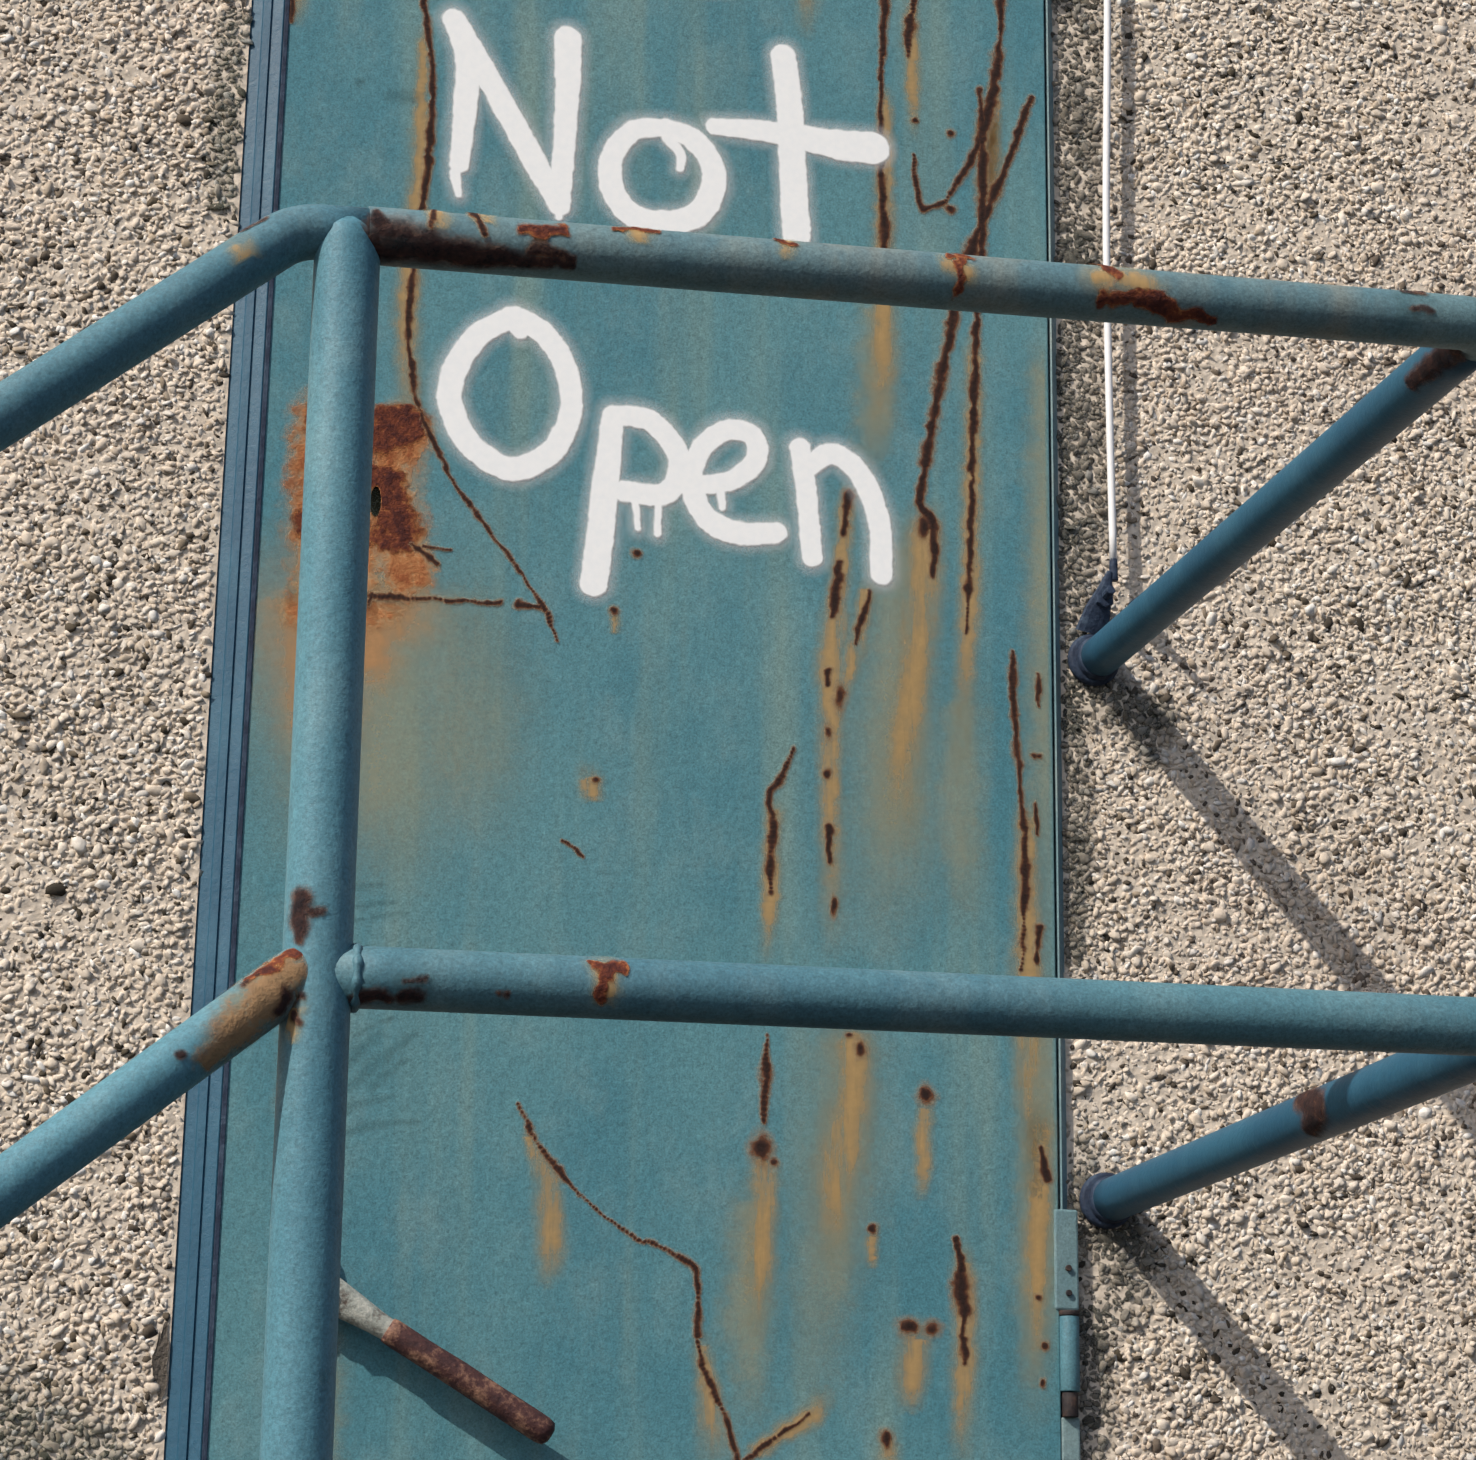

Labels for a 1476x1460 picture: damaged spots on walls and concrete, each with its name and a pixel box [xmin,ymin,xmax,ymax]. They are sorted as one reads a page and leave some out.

corrosion [363,209,577,270]
corrosion [1088,263,1217,326]
corrosion [1405,348,1465,391]
corrosion [278,402,307,727]
corrosion [364,404,544,704]
corrosion [819,488,872,877]
corrosion [830,896,838,918]
corrosion [286,992,305,1039]
corrosion [916,1085,935,1180]
corrosion [1294,1087,1326,1137]
corrosion [899,1235,975,1427]